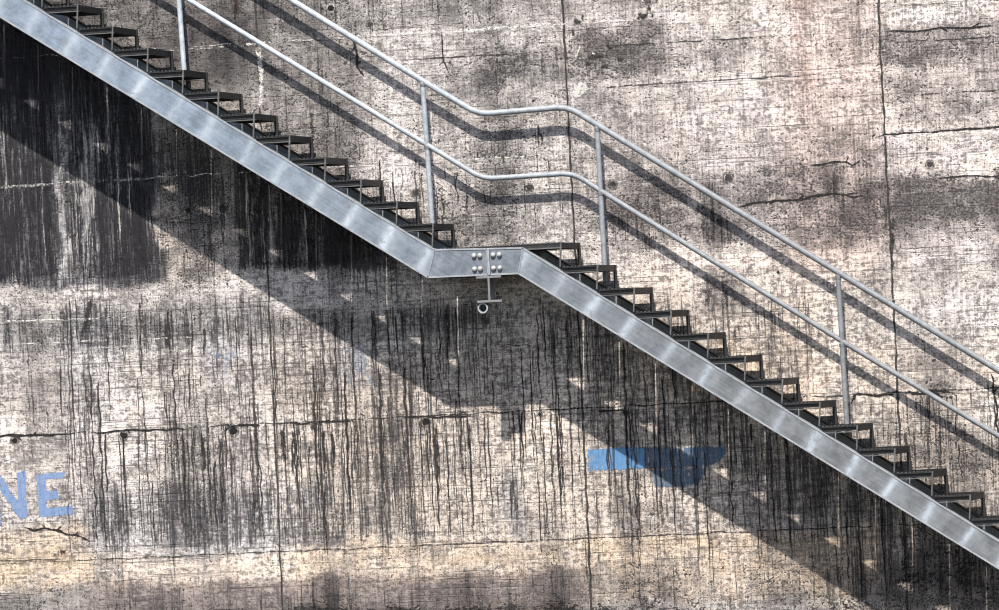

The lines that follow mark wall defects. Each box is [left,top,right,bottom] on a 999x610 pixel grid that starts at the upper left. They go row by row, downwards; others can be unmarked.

crack [889,23,996,32]
crack [872,126,999,137]
water stain [0,22,164,287]
crack [810,157,860,166]
crack [740,192,863,207]
water stain [31,299,499,564]
water stain [510,304,583,557]
water stain [586,342,975,602]
crack [25,525,90,542]
crack [0,556,59,564]